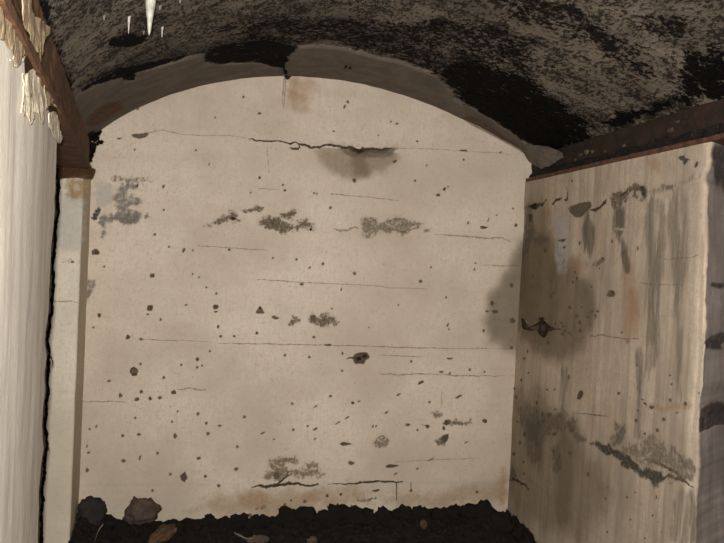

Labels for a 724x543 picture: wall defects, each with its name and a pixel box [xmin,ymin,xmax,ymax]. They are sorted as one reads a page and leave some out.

peeling [0,0,63,143]
crack [248,138,439,154]
leakage [91,177,148,237]
crack [40,179,66,543]
leakage [264,457,321,480]
crack [251,475,403,501]